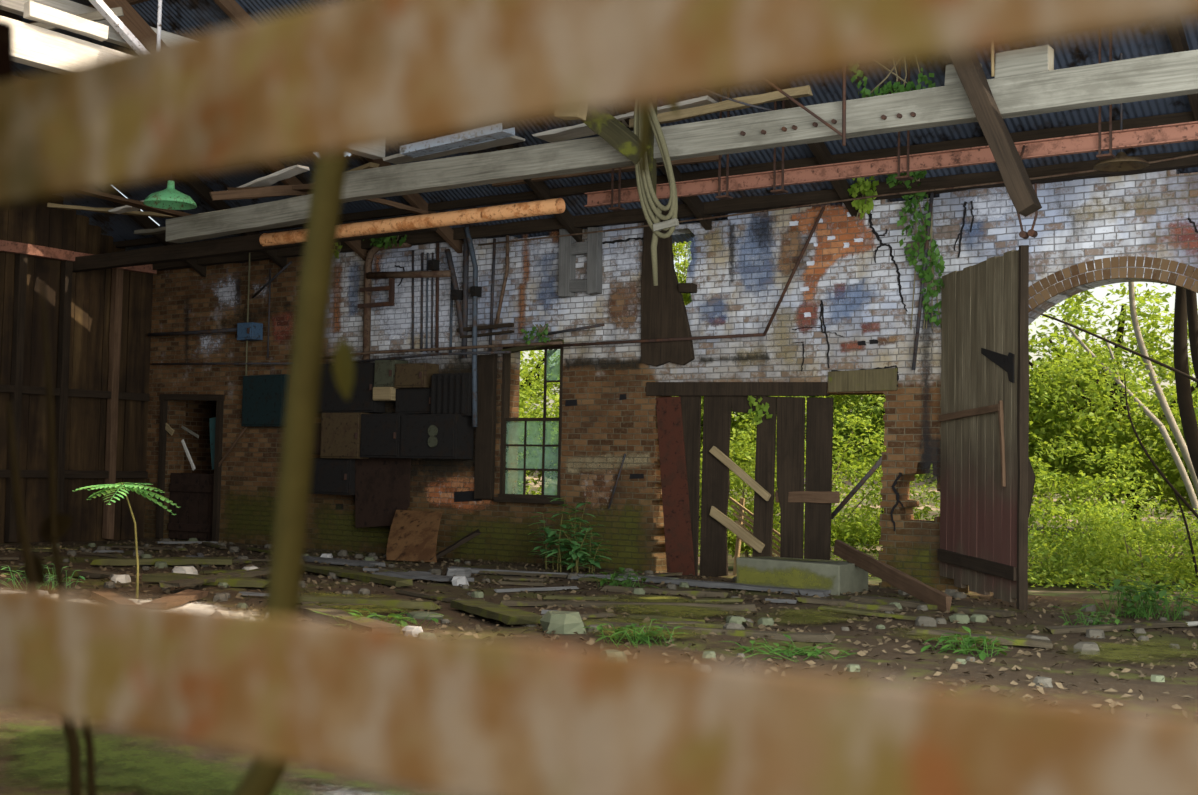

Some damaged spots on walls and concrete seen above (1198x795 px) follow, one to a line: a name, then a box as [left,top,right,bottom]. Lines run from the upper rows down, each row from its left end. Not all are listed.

spalling [777,205,876,334]
crack [867,213,907,311]
crack [954,201,974,258]
spalling [841,322,897,352]